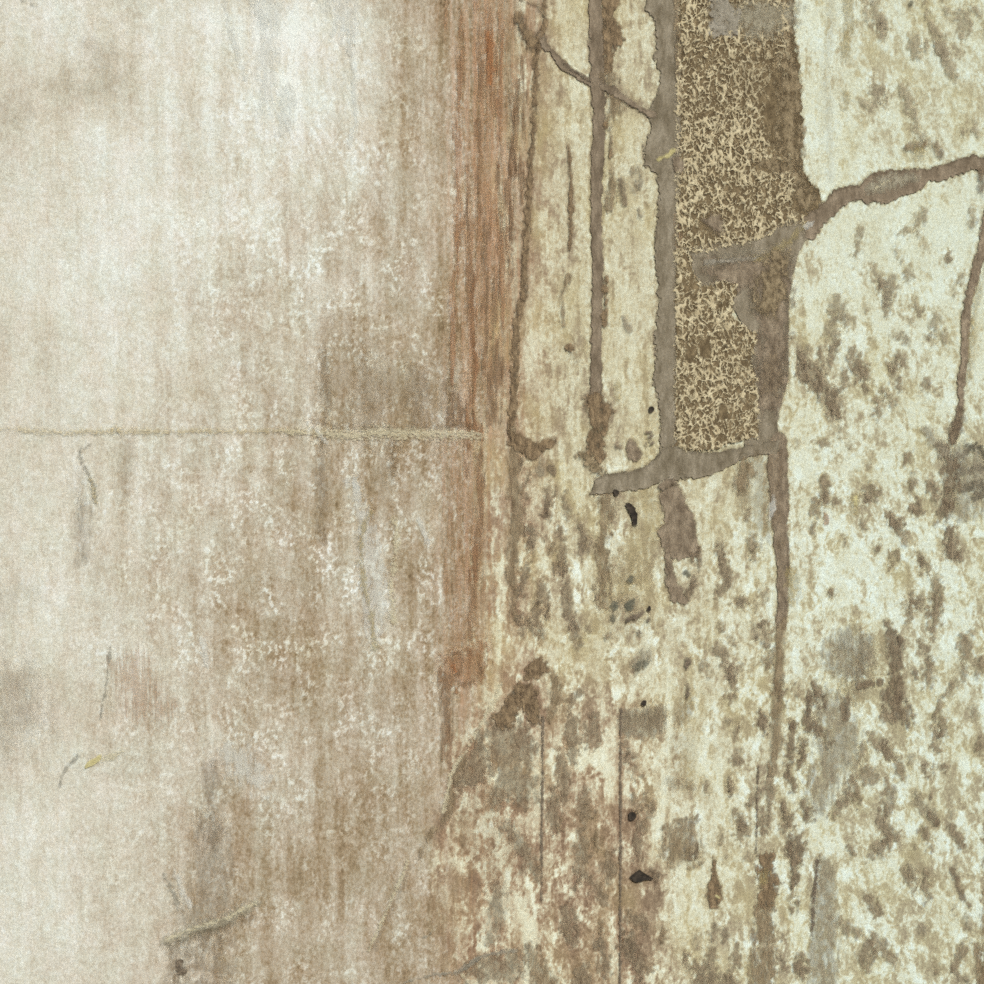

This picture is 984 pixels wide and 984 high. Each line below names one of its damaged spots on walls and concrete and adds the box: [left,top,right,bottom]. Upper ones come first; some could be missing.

corrosion [478,25,495,98]
spalling [673,0,905,454]
crack [803,140,984,240]
crack [949,216,984,444]
crack [285,425,481,440]
corrosion [438,56,527,761]
crack [505,0,790,854]
damp [592,493,615,609]
damp [935,441,984,557]
damp [840,678,884,721]
damp [748,850,781,984]
damp [810,859,820,931]